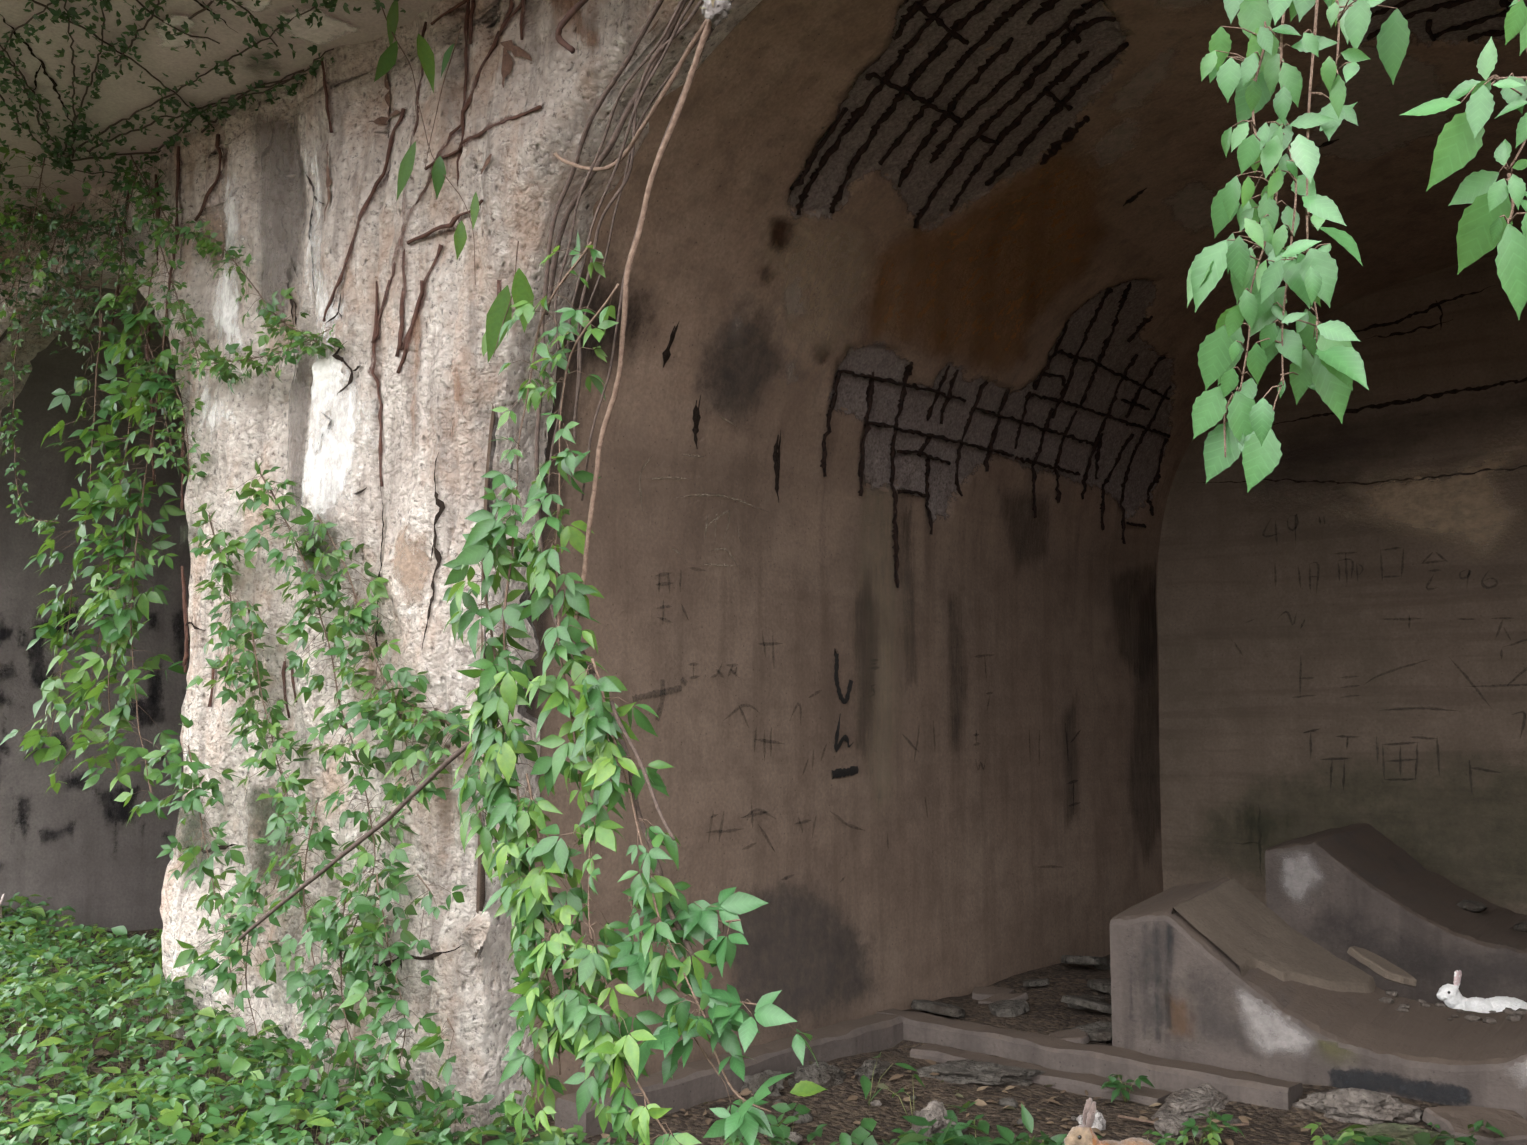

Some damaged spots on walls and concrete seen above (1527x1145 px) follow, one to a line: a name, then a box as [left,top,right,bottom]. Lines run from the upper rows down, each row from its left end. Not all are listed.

rust [324,144,332,221]
rust [369,73,400,138]
rust [500,40,532,88]
spalling [787,0,1129,232]
spalling [820,279,1177,588]
crack [422,453,445,649]